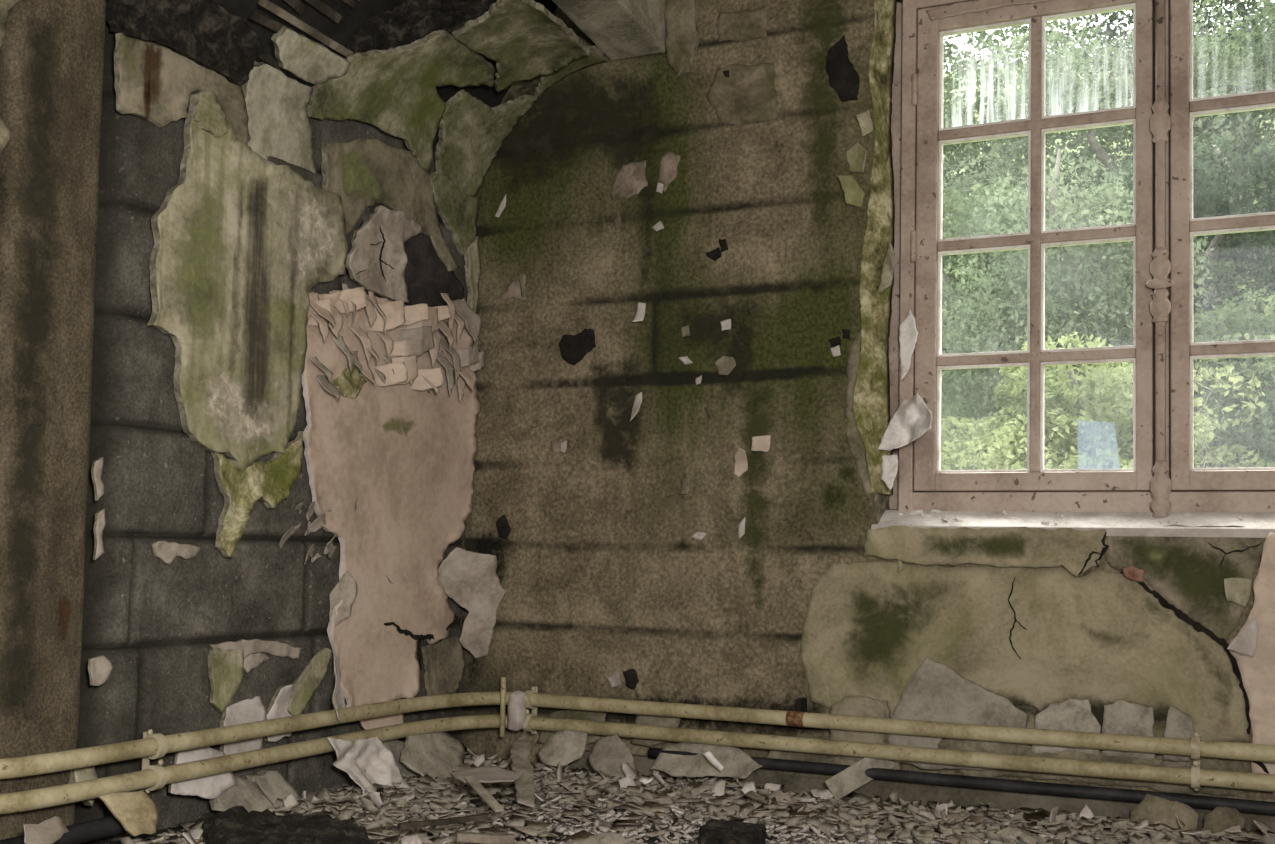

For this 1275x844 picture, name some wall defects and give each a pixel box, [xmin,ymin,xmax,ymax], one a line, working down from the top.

spalling [825,0,932,497]
damp [210,294,270,438]
peeling [114,33,505,727]
damp [597,370,636,463]
damp [691,313,745,379]
flaking render [720,319,731,331]
flaking render [734,435,771,477]
flaking render [864,526,1275,745]
crack [1078,532,1269,774]
peeling [327,737,403,795]
flaking render [954,768,1249,796]
flaking render [1155,754,1275,775]